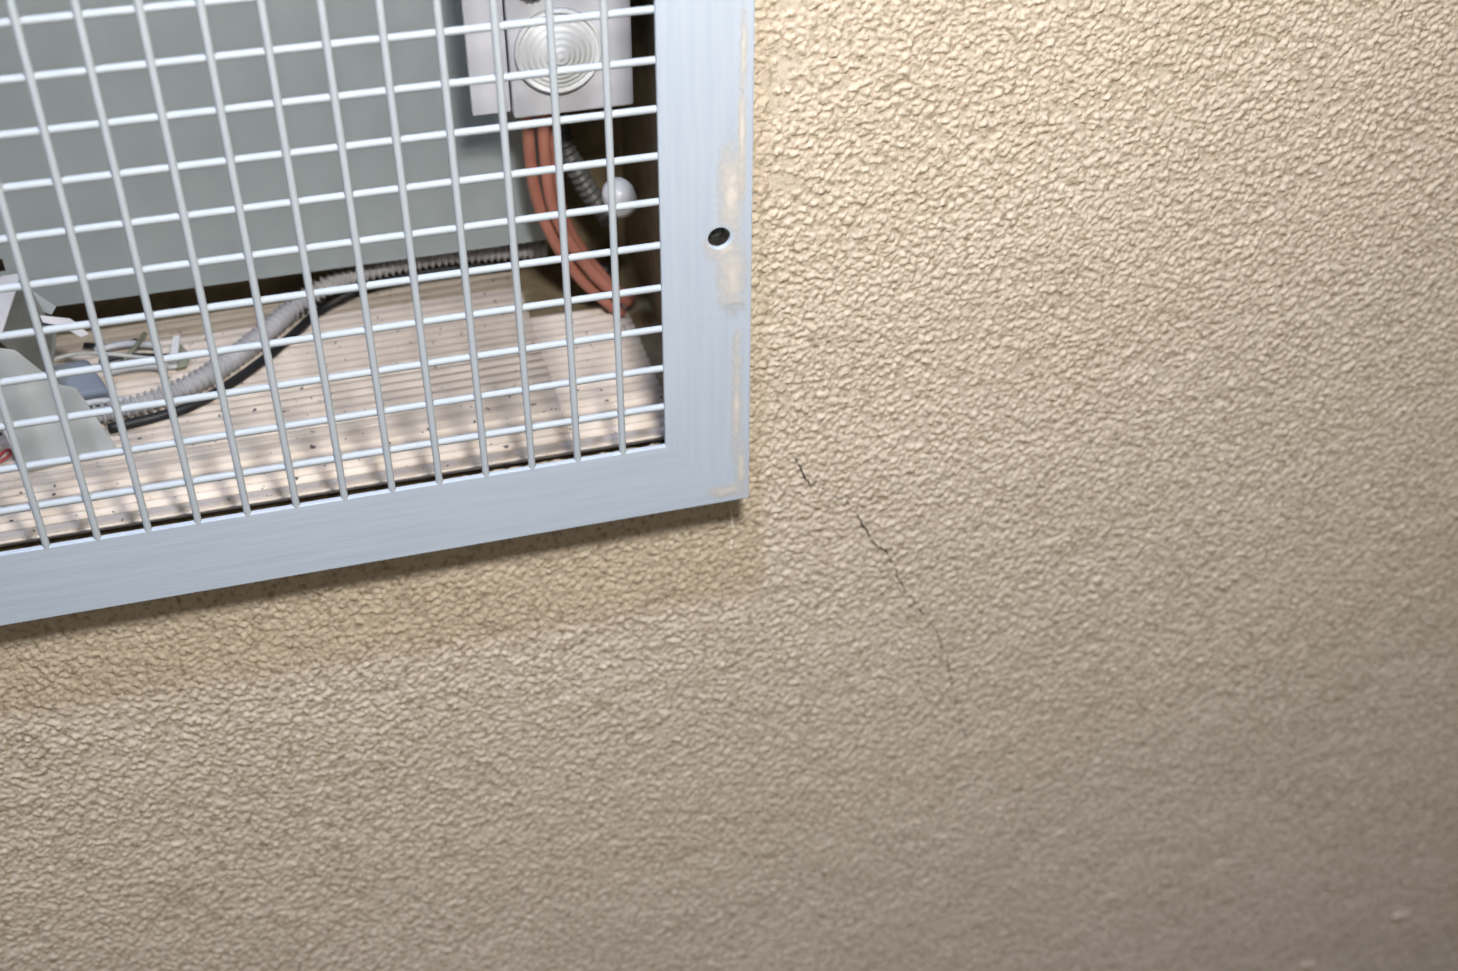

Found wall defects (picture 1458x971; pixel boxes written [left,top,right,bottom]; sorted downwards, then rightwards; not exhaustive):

crack [793,457,967,739]